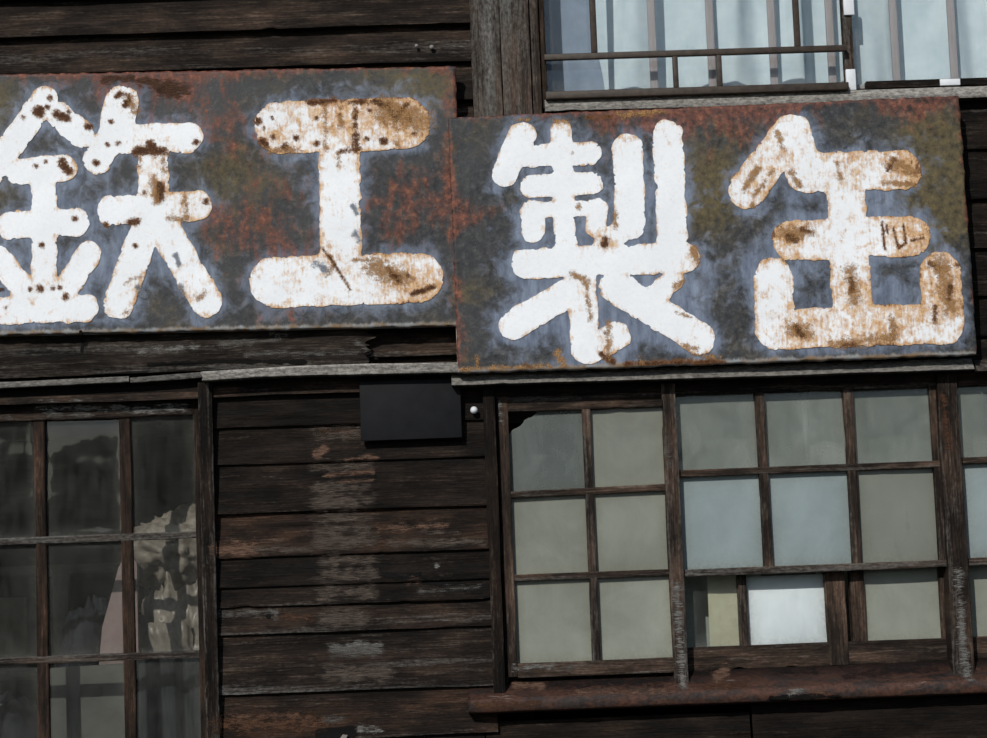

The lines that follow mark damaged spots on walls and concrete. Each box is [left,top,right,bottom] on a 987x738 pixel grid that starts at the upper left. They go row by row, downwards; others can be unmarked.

corrosion [22,95,72,122]
corrosion [101,75,190,116]
corrosion [253,115,302,155]
corrosion [305,95,436,167]
corrosion [32,157,73,176]
corrosion [131,139,168,204]
corrosion [776,222,815,244]
corrosion [28,284,69,301]
corrosion [352,253,436,297]
corrosion [569,271,593,320]
corrosion [928,252,960,323]
corrosion [598,321,726,368]